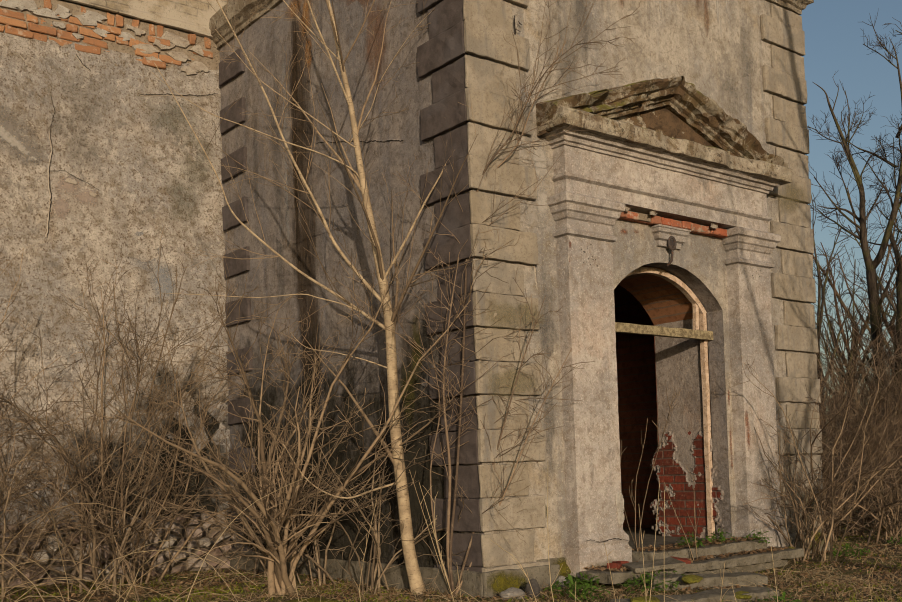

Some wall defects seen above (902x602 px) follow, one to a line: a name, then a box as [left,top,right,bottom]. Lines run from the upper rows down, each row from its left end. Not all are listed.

flaking render [0,0,217,76]
flaking render [640,107,714,147]
flaking render [650,430,724,538]